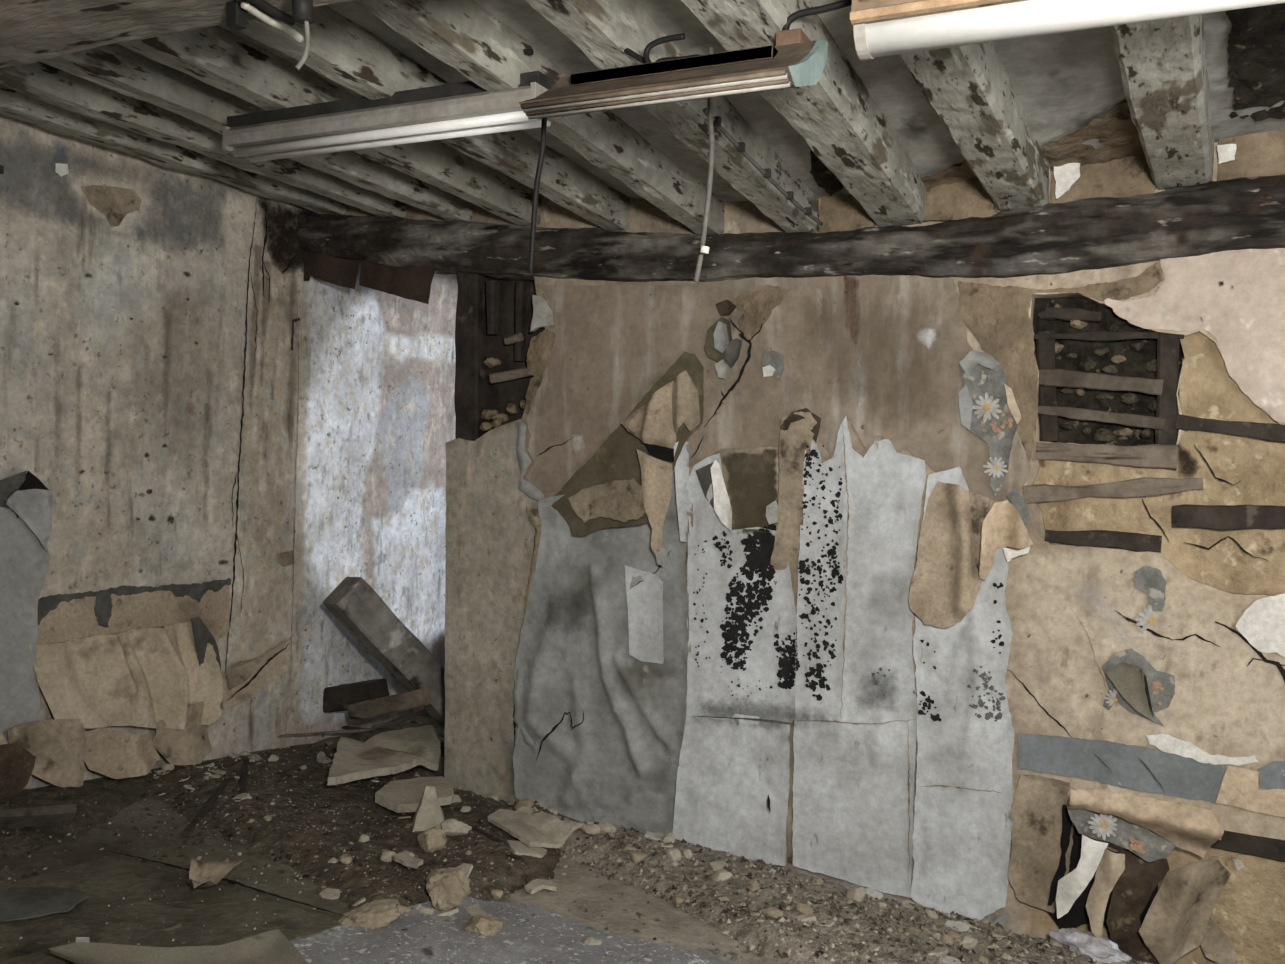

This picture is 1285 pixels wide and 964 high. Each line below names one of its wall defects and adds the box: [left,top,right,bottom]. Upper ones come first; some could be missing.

spalling [1042,102,1144,171]
spalling [809,150,844,196]
spalling [958,261,1164,463]
peeling [566,478,646,523]
peeling [624,565,664,664]
leakage [693,445,843,721]
peeling [909,481,991,628]
crack [1074,612,1108,691]
crack [1115,610,1285,682]
leakage [913,691,942,722]
leakage [967,666,1005,722]
crack [1009,670,1072,738]